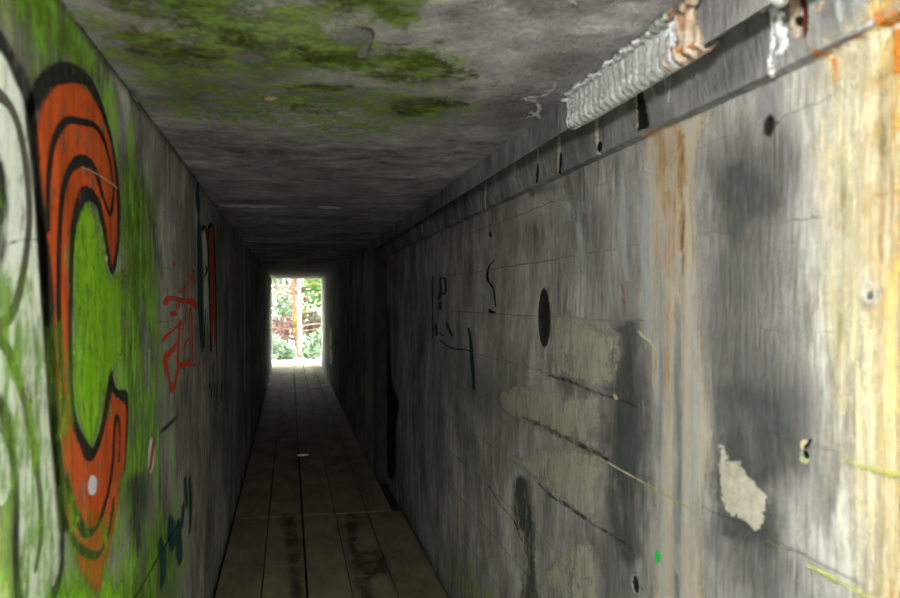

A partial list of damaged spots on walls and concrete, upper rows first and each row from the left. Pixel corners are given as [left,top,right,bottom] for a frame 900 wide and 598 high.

water stain [761,0,790,78]
water stain [519,0,719,598]
rust [812,0,900,598]
water stain [727,388,789,484]
water stain [513,477,539,598]
peeling [718,443,771,531]
water stain [717,473,776,545]